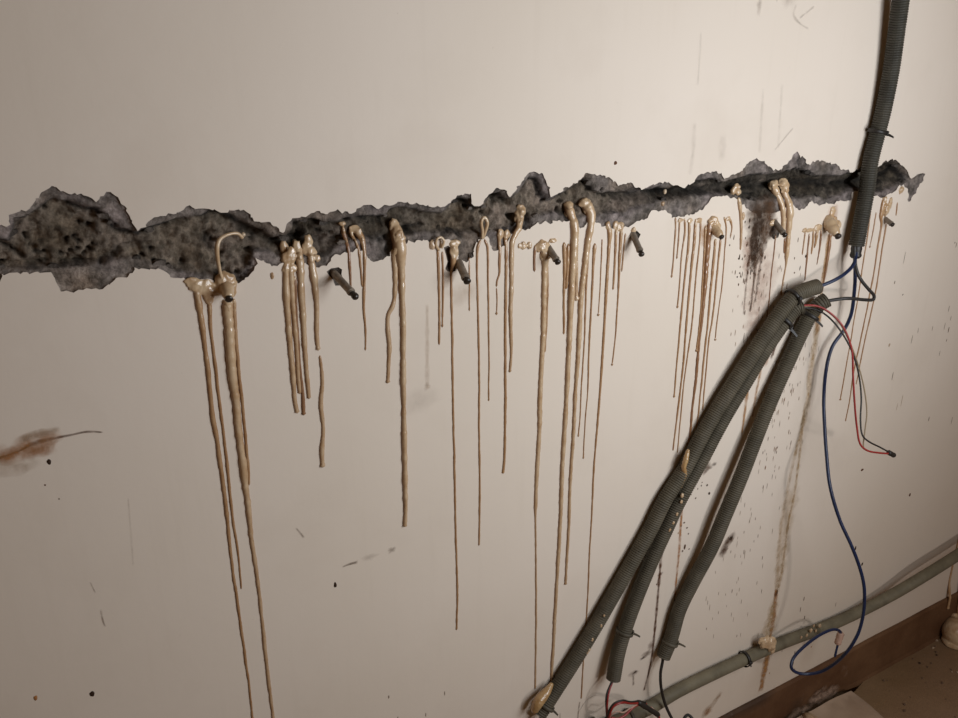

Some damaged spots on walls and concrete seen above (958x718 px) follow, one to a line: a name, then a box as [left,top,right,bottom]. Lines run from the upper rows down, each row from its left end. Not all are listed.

spalling [0,152,862,293]
spalling [874,159,925,202]
leakage [671,178,841,453]
corrosion [0,431,101,461]